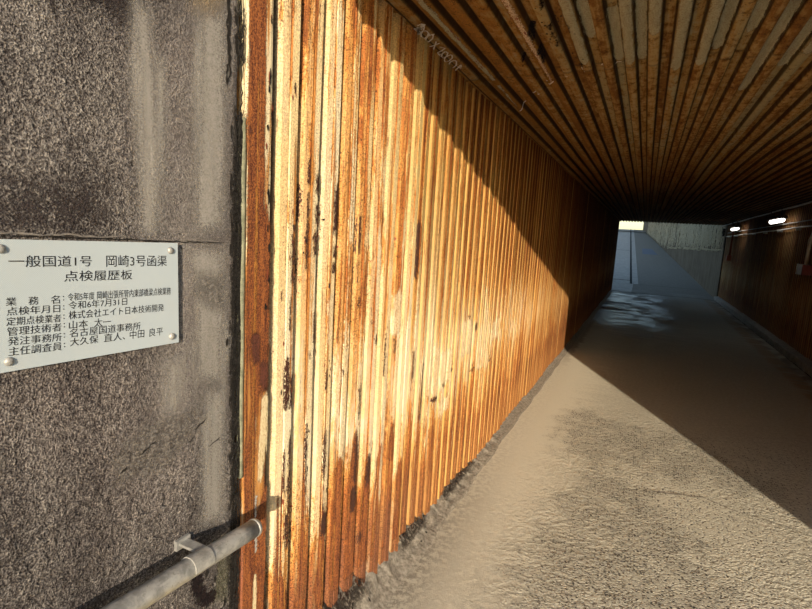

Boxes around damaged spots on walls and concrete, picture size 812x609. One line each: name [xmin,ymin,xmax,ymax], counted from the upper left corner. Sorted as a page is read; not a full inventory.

water stain [234,3,247,70]
corrosion [242,0,402,609]